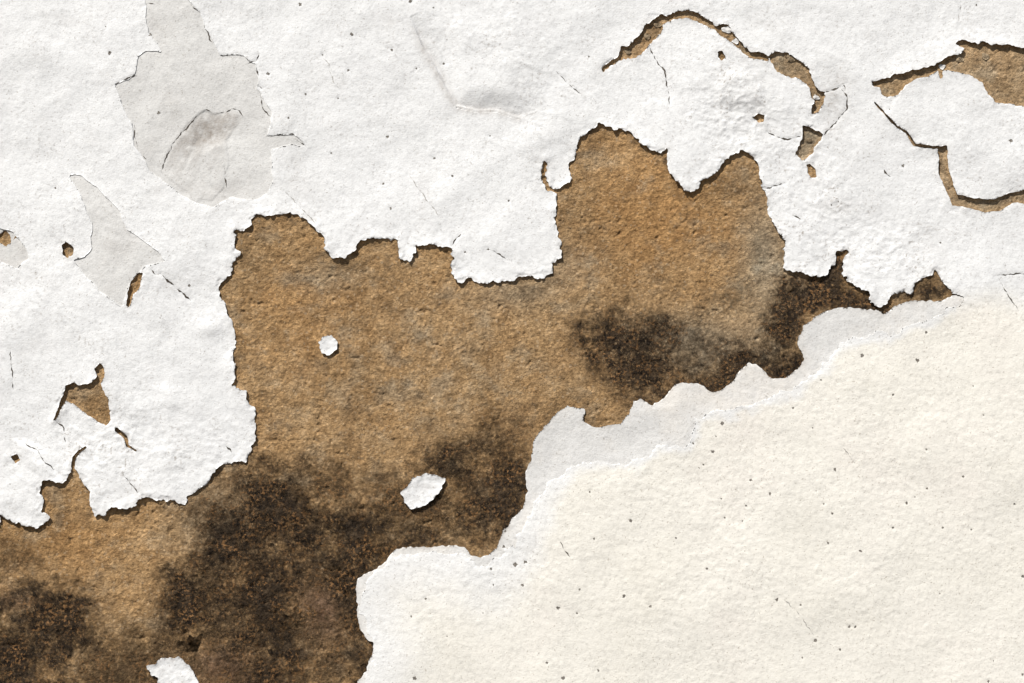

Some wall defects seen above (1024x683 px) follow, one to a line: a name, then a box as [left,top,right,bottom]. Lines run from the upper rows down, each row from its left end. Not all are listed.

peeling [601,18,809,192]
spalling [872,40,1024,199]
peeling [0,123,964,683]
damp [569,253,892,406]
damp [909,282,963,302]
damp [0,402,535,683]